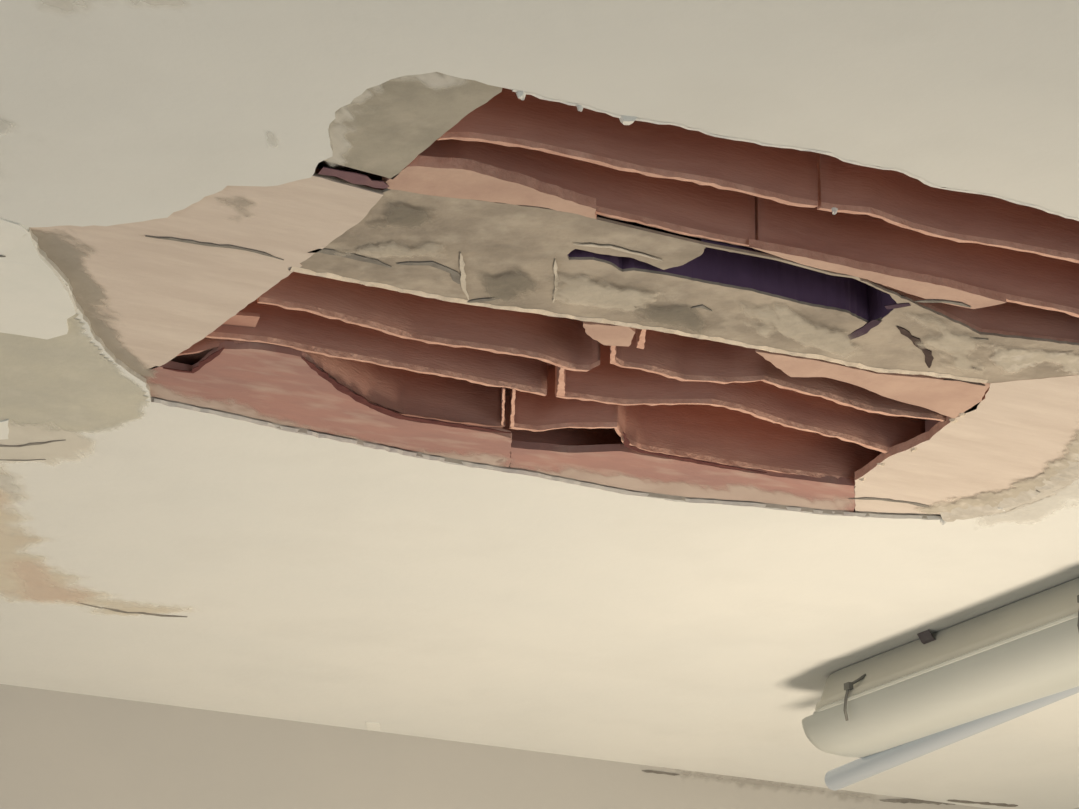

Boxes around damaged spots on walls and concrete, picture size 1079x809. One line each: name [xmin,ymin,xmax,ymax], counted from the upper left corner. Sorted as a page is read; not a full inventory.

spalling [512,89,1079,221]
peeling [0,215,1079,525]